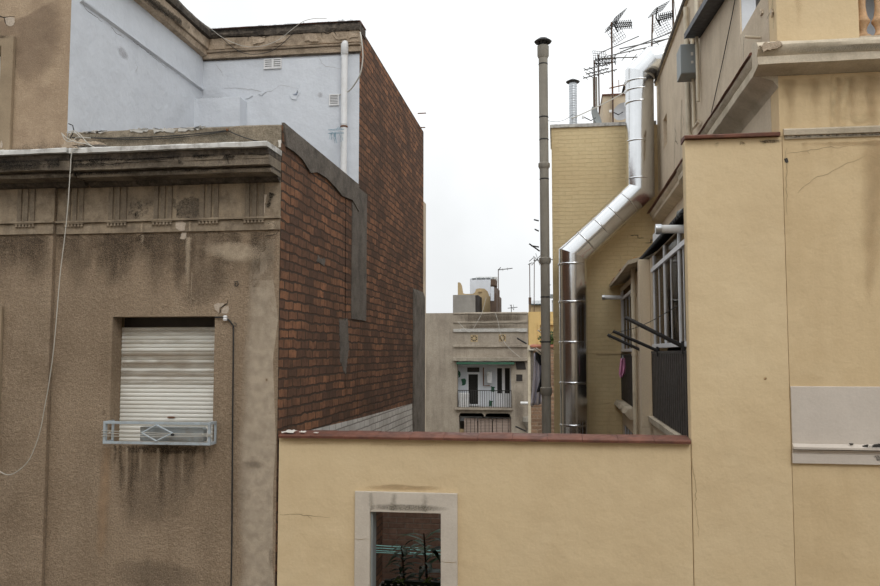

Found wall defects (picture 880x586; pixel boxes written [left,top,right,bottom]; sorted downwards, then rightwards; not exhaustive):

leakage [762,73,880,311]
leakage [106,220,326,586]